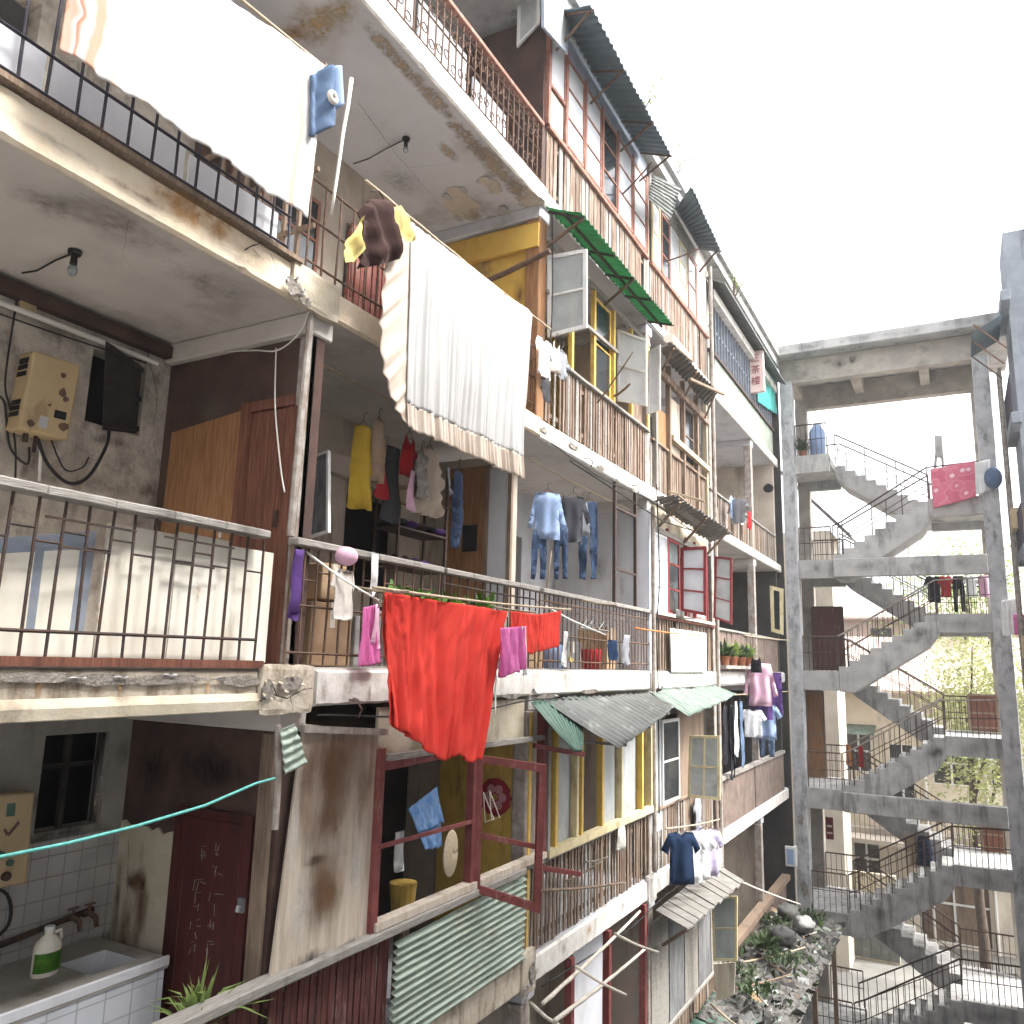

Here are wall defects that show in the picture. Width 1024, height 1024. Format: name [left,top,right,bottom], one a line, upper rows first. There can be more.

peeling [368,27,545,221]
spalling [285,275,312,308]
spalling [0,672,306,701]